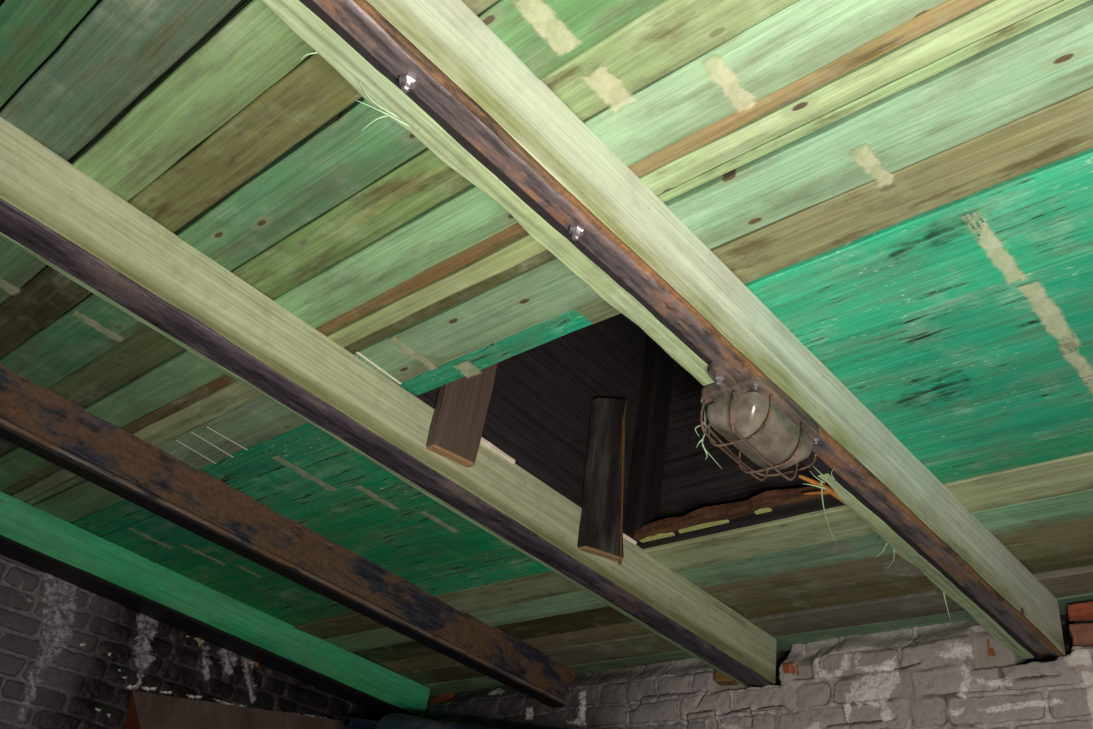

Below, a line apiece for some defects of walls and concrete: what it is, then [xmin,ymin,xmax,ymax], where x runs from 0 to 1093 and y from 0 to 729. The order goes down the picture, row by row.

rust [353,0,1065,657]
leakage [15,573,78,728]
leakage [127,614,172,694]
leakage [814,651,901,722]
flaking render [1067,601,1093,647]